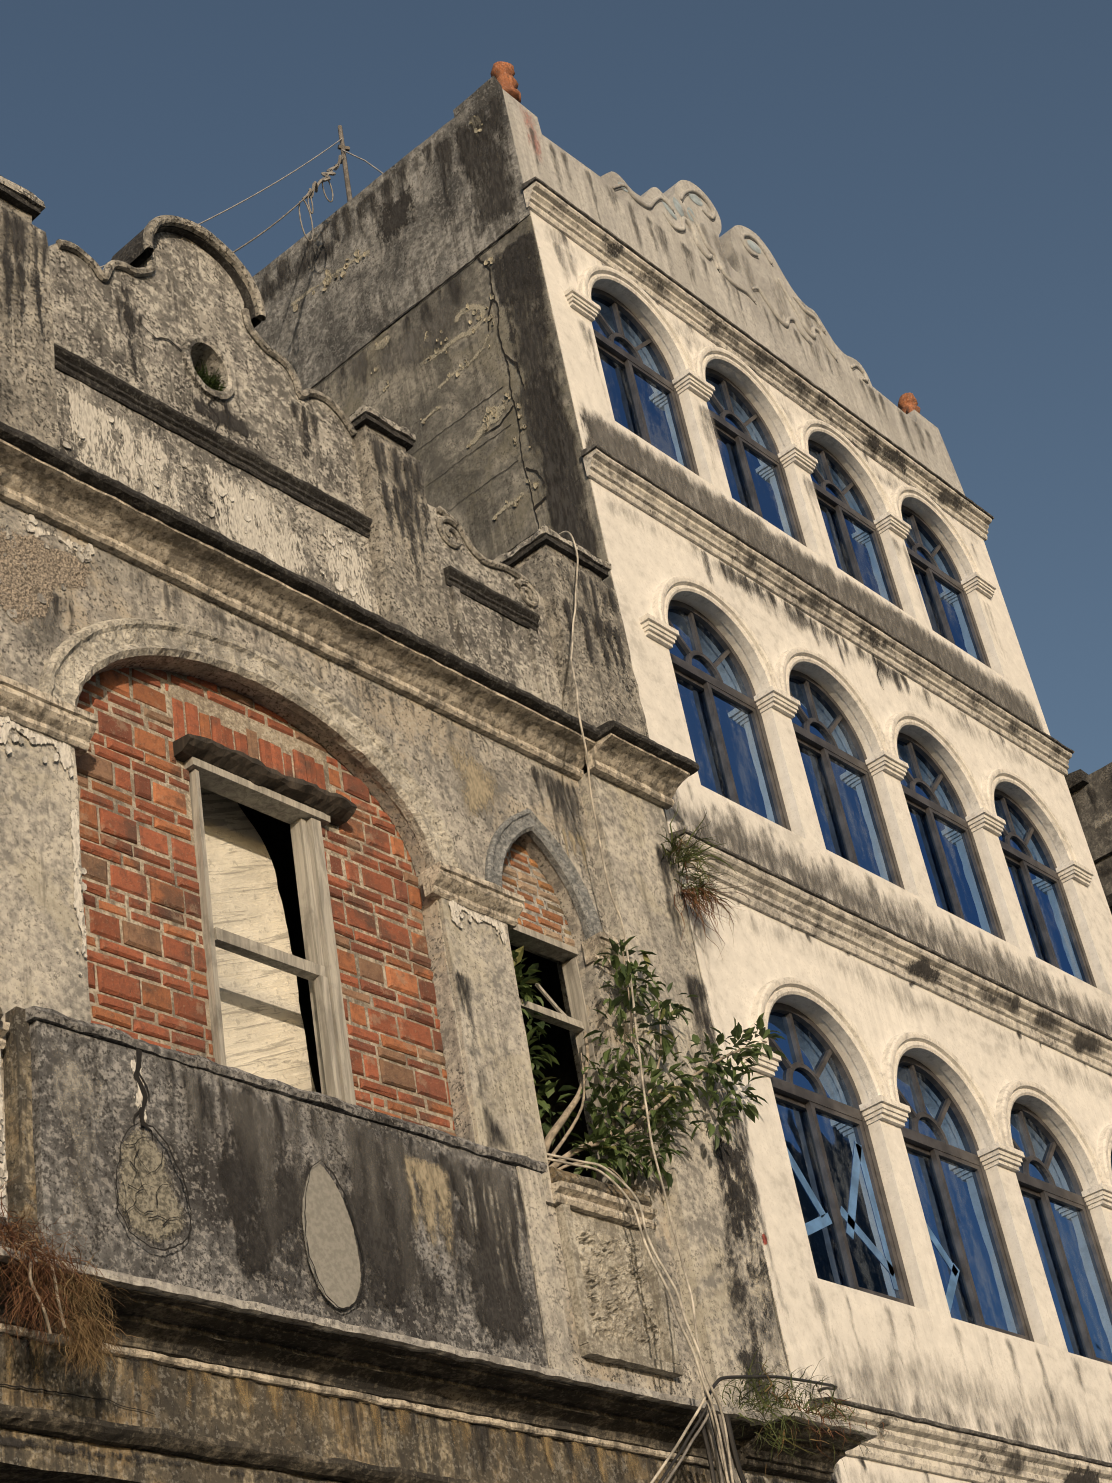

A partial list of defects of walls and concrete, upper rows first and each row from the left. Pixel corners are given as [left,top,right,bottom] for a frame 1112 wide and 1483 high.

leakage [111,96,515,328]
leakage [587,173,707,275]
spalling [0,514,95,624]
peeling [60,386,187,512]
peeling [206,464,376,614]
leakage [291,401,318,459]
crack [310,223,547,529]
leakage [492,231,1042,742]
leakage [130,1060,147,1122]
crack [115,1048,192,1251]
leakage [169,1062,533,1346]
leakage [1046,1389,1112,1483]